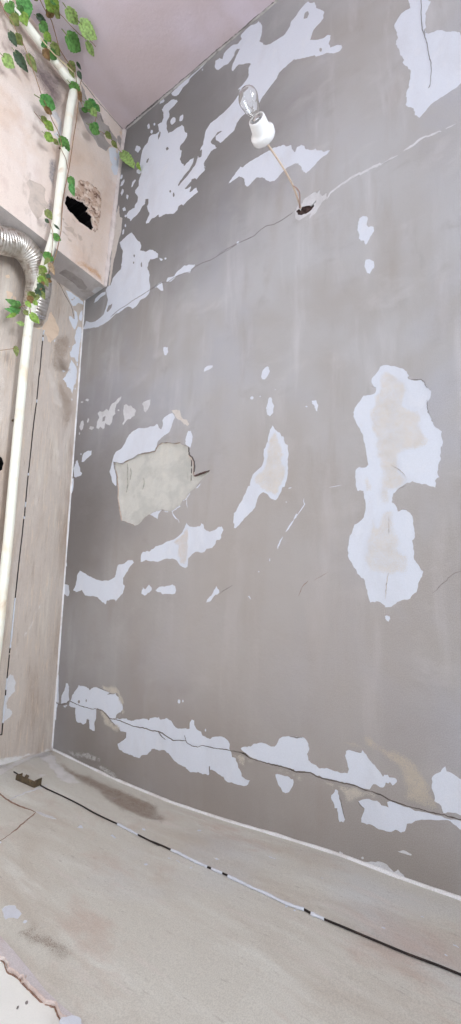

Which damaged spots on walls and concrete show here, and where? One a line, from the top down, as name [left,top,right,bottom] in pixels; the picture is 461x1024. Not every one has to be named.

crack [421,4,432,88]
peeling [394,0,461,118]
peeling [59,2,342,403]
crack [326,124,455,200]
peeling [64,389,292,604]
peeling [348,365,443,622]
peeling [55,674,461,832]
crack [56,701,461,820]